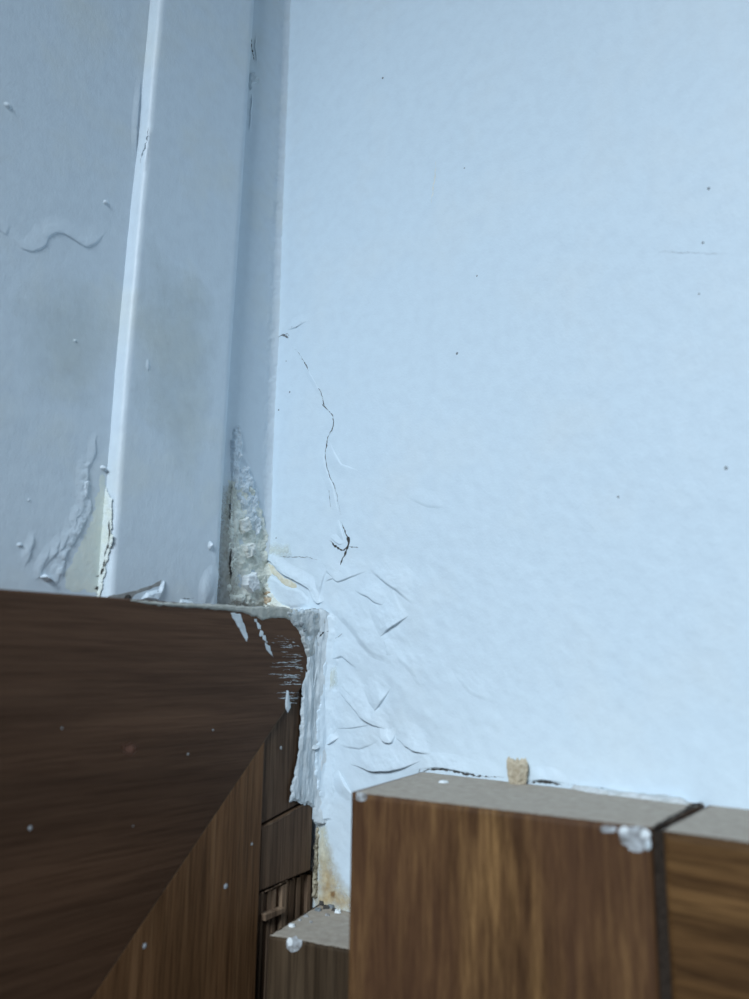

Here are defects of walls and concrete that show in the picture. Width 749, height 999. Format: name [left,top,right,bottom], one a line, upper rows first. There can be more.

peeling [19,432,165,601]
flaking render [223,424,325,610]
crack [279,322,352,565]
rust [317,828,349,909]